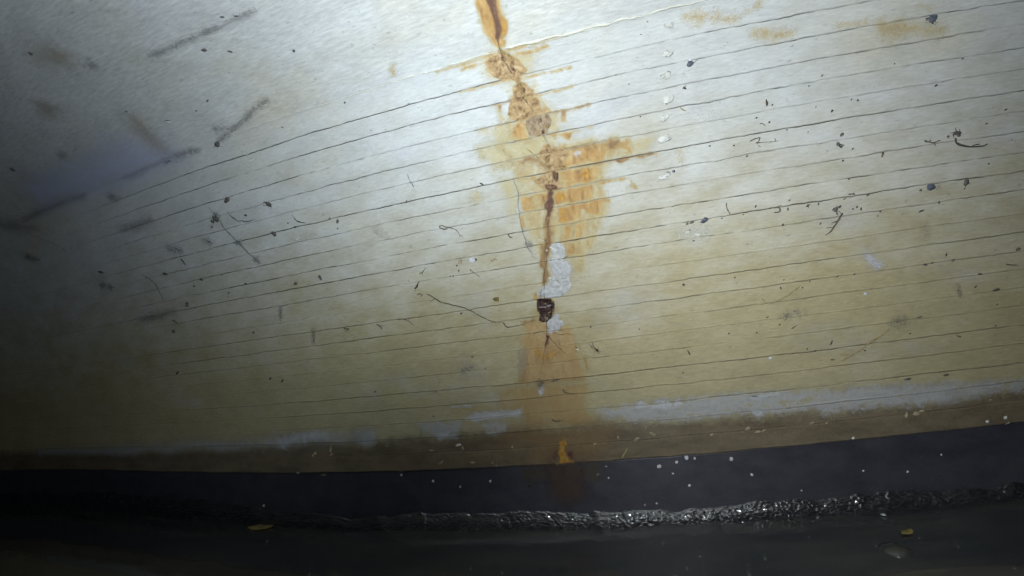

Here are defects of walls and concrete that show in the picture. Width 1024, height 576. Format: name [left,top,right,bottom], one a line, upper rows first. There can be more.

corrosion [434,0,659,278]
crack [491,0,569,374]
damp [537,240,573,298]
spalling [532,291,558,322]
corrosion [515,318,592,388]
damp [547,312,564,335]
damp [0,376,1024,489]